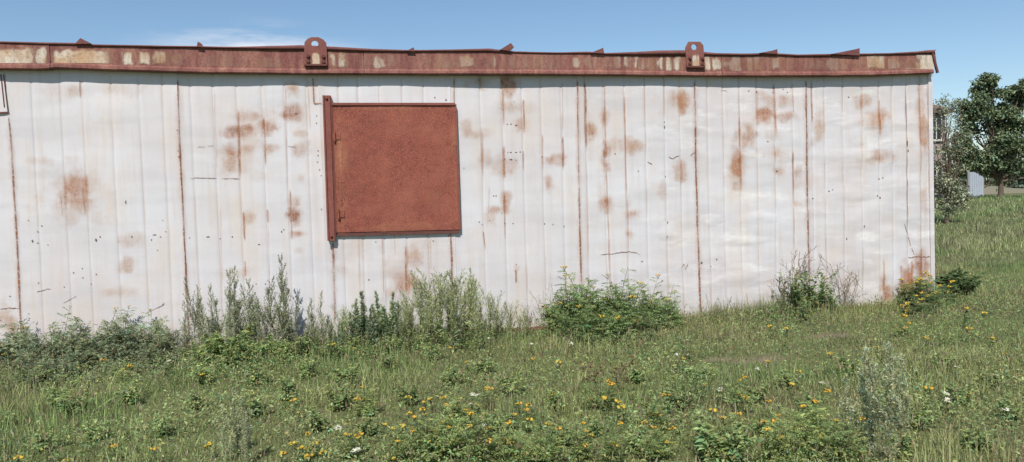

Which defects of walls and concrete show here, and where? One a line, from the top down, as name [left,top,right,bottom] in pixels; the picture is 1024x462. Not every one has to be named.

corrosion [731,156,741,176]
corrosion [12,170,21,329]
corrosion [901,255,929,291]